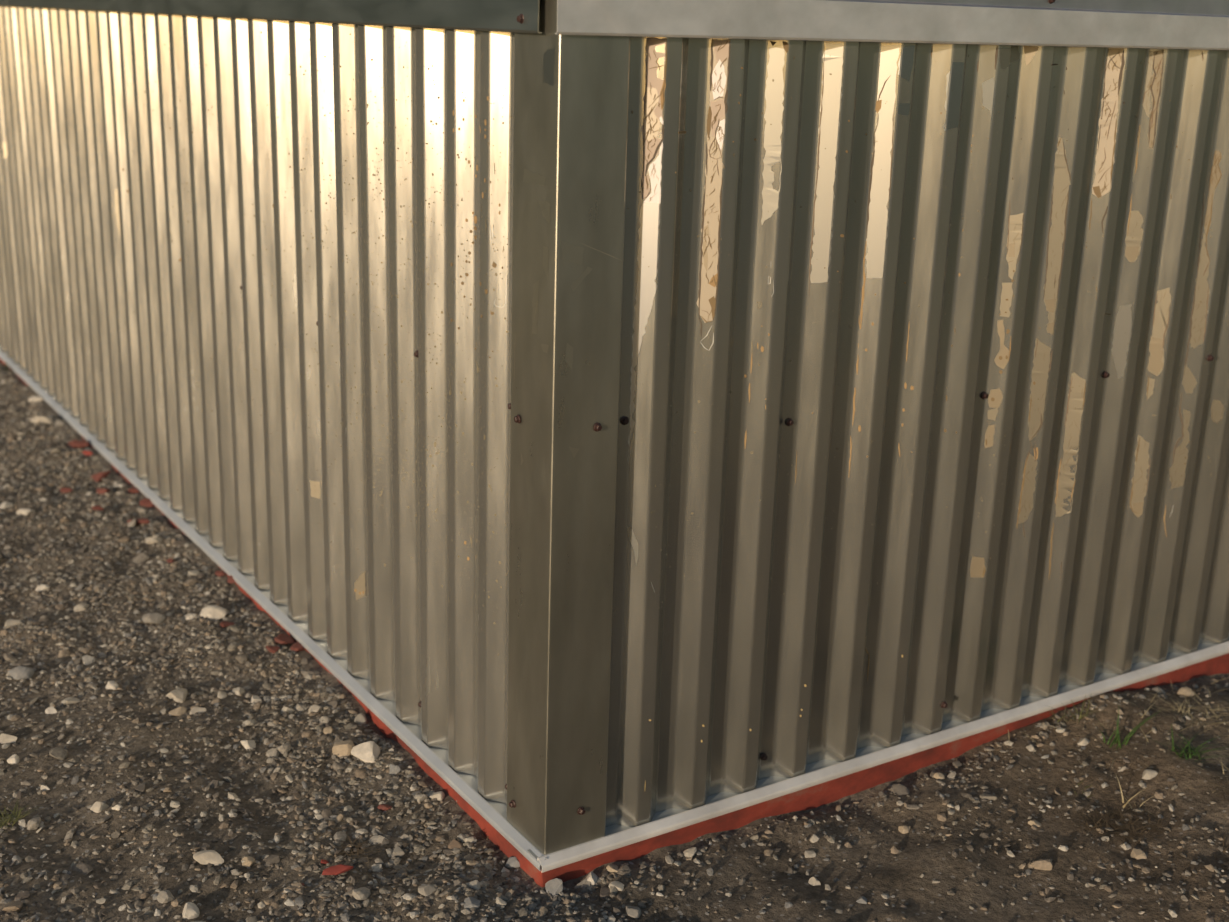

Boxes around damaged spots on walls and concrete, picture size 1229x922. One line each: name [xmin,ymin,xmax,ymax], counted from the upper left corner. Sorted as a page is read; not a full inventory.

peeling [641,37,667,204]
peeling [696,39,730,323]
peeling [1092,48,1125,197]
peeling [1204,150,1222,235]